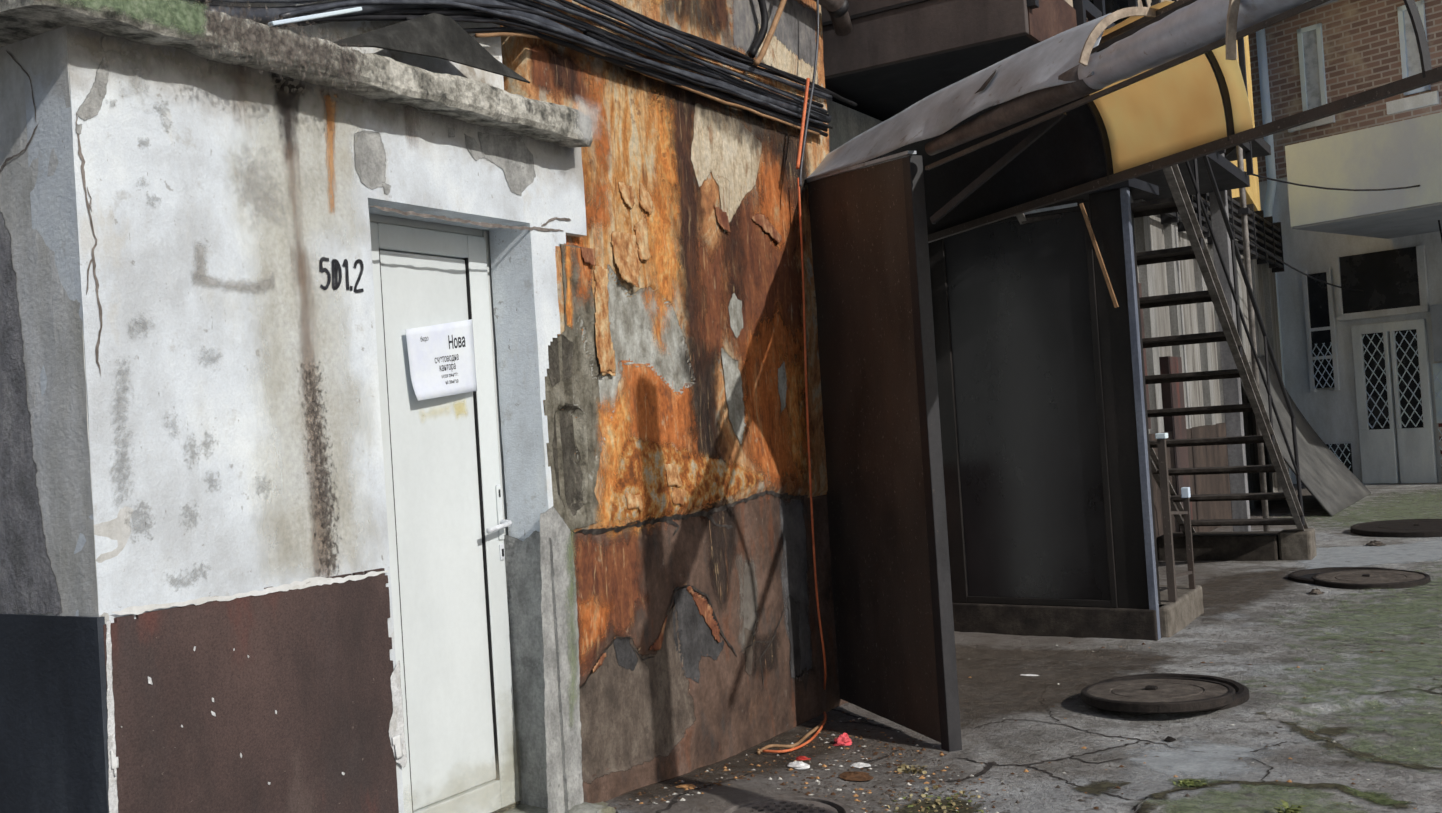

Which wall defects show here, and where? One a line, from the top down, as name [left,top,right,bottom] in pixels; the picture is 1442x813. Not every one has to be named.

crack [0,52,38,171]
flaking render [76,57,109,134]
rust [322,93,337,211]
peeling [354,130,391,194]
peeling [448,128,536,196]
flaking render [691,103,782,243]
crack [76,112,102,375]
water stain [77,0,443,573]
rust [530,42,814,675]
peeling [504,182,724,813]
crack [1376,685,1442,694]
crack [948,705,1296,813]